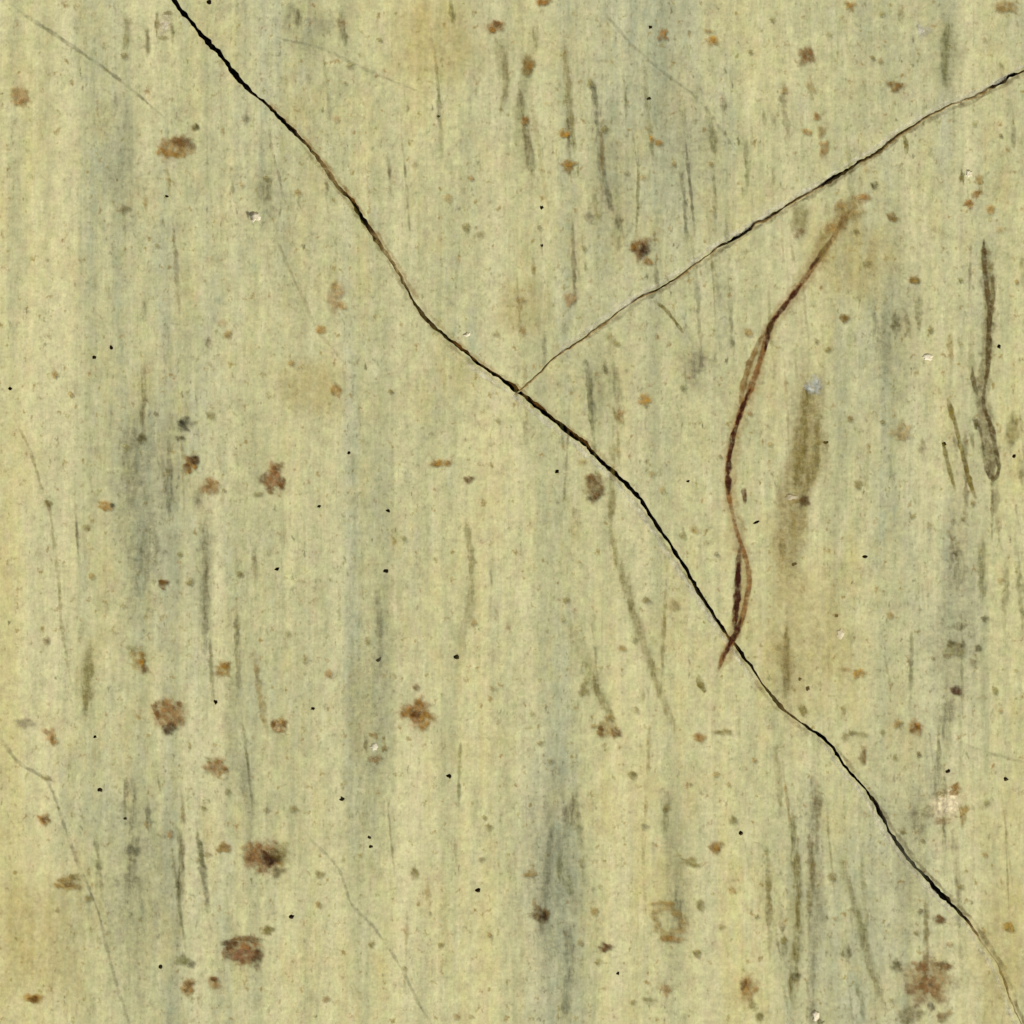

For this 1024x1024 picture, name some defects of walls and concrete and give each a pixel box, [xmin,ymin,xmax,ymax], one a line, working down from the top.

rust [156,124,198,157]
crack [171,0,1024,645]
rust [260,464,285,493]
rust [153,701,181,734]
rust [401,686,430,730]
crack [719,575,1022,1024]
rust [246,842,285,877]
rust [222,926,273,966]